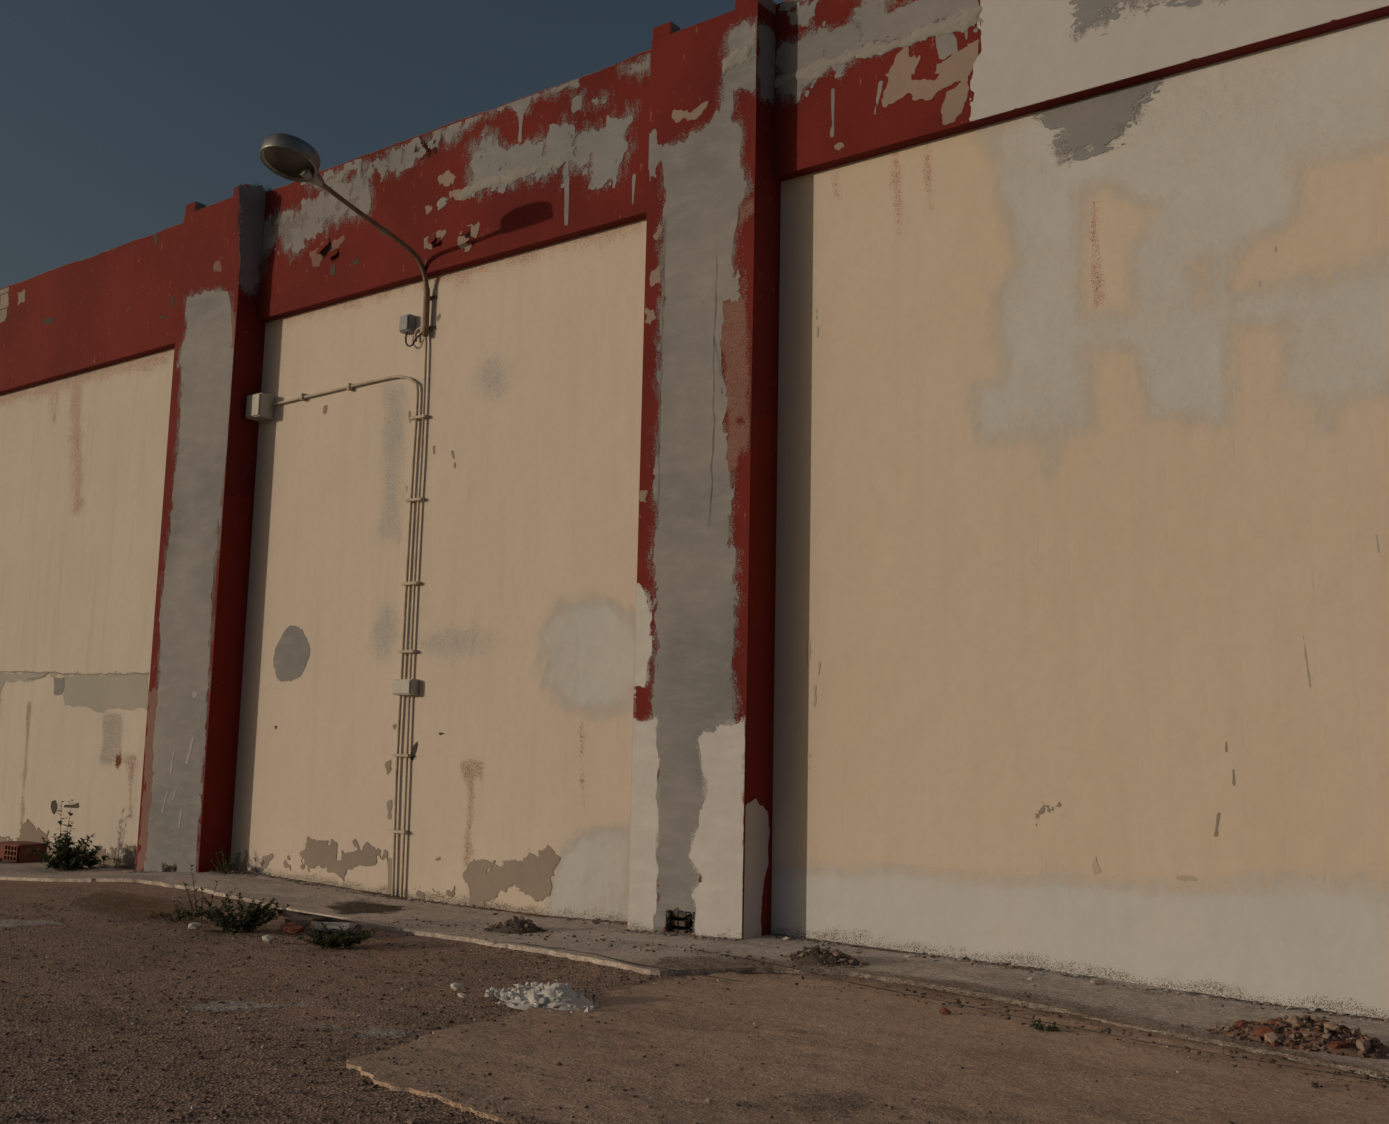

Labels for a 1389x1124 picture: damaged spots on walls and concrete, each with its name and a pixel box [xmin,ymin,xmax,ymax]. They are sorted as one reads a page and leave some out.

peeling [779,0,826,27]
peeling [881,27,979,125]
peeling [416,53,651,163]
peeling [672,101,709,123]
peeling [438,170,471,201]
peeling [424,222,480,252]
flaking render [0,287,25,323]
peeling [720,294,752,477]
peeling [634,583,653,698]
peeling [0,670,158,871]
flaking render [230,836,392,894]
flaking render [414,845,561,908]